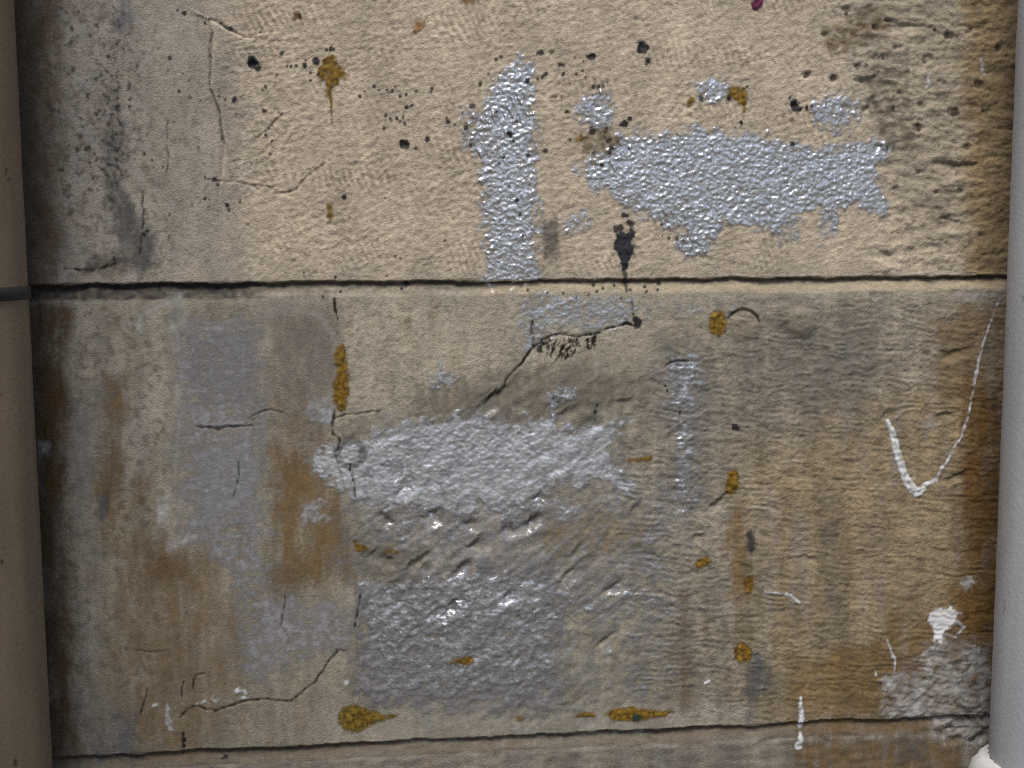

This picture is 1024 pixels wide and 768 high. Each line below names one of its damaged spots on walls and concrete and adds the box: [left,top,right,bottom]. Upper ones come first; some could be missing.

water stain [111,189,153,271]
crack [488,322,633,398]
crack [181,650,338,715]